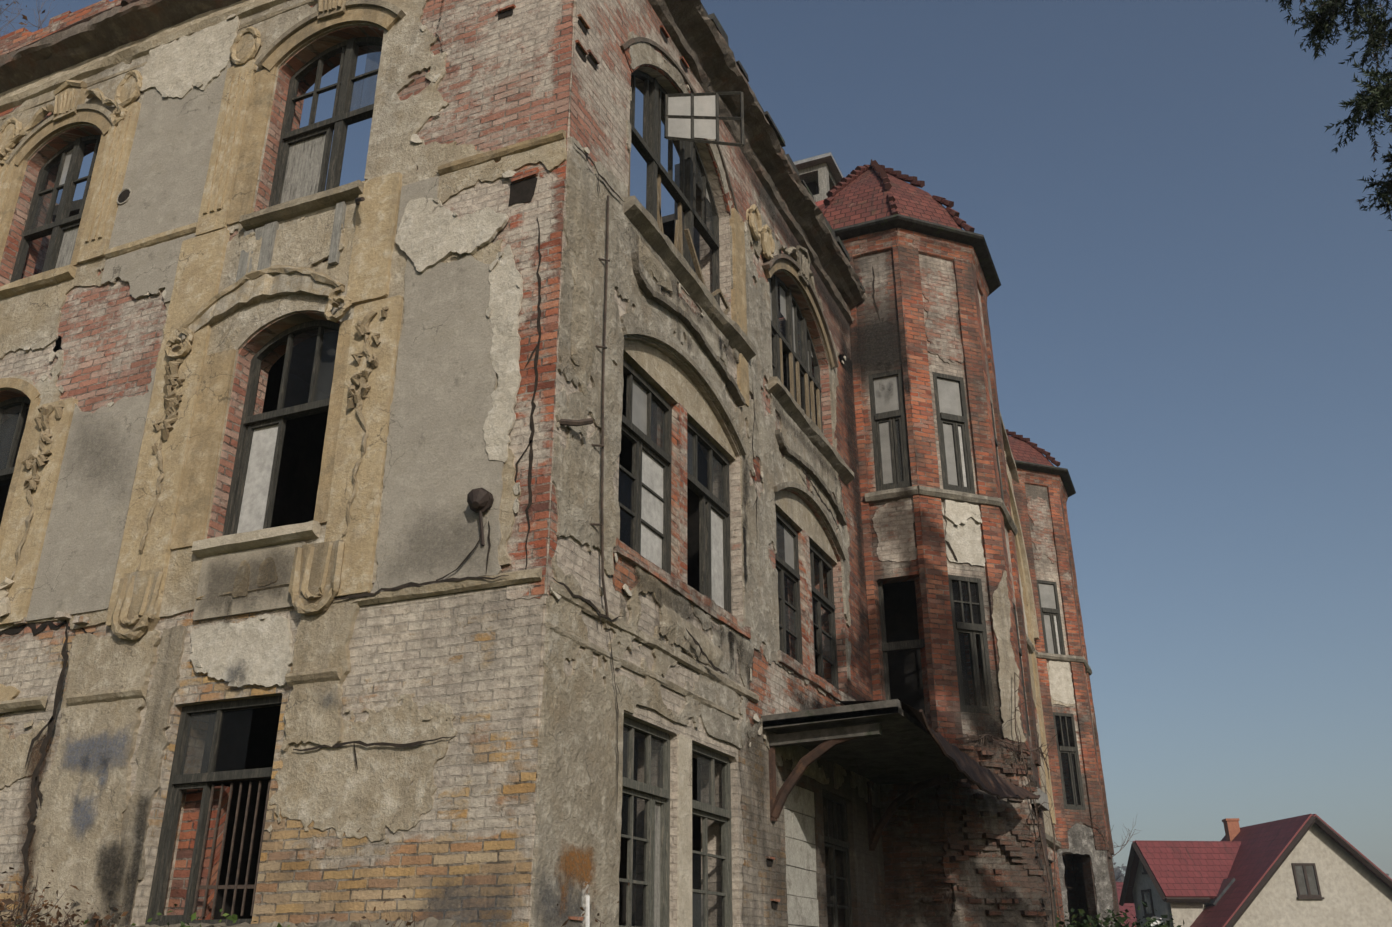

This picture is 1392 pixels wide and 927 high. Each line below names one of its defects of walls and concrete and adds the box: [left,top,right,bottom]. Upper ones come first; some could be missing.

flaking render [411,0,705,187]
flaking render [0,278,167,413]
flaking render [395,162,566,600]
flaking render [190,614,294,688]
crack [333,218,623,811]
flaking render [738,263,873,927]
flaking render [944,500,982,526]
crack [0,611,93,913]
crack [293,736,456,770]
corrosion [560,847,593,912]
corrosion [839,700,1040,800]
spalling [935,732,1052,927]